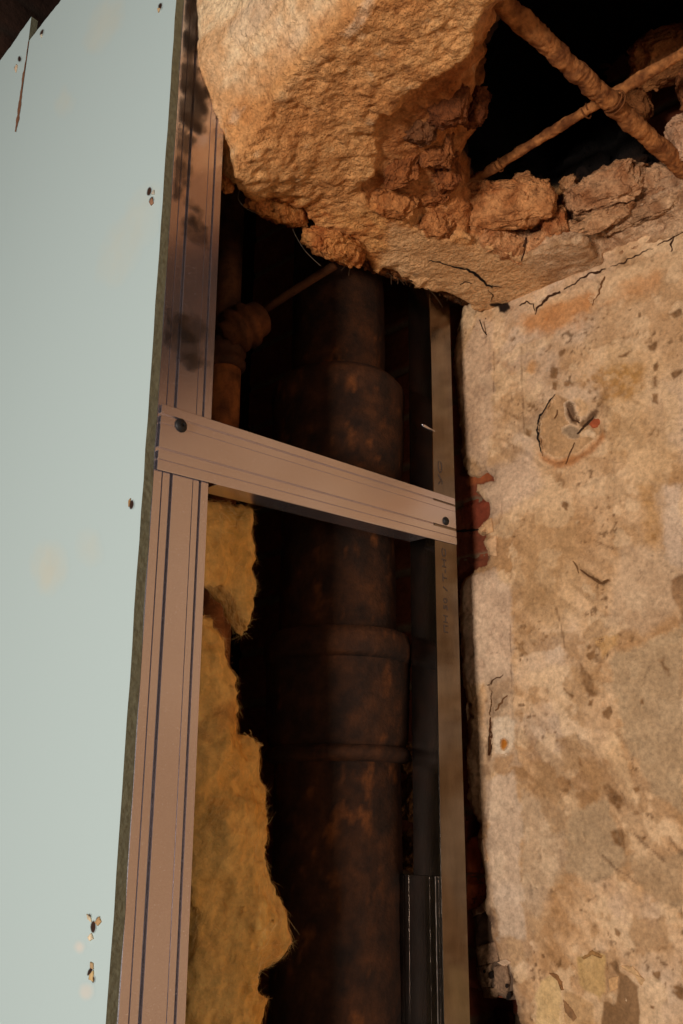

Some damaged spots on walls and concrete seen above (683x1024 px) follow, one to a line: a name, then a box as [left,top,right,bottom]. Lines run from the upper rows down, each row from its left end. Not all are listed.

spalling [622,22,683,161]
spalling [374,83,681,265]
crack [429,260,501,300]
crack [519,232,683,315]
crack [536,394,575,463]
flaking render [457,470,497,581]